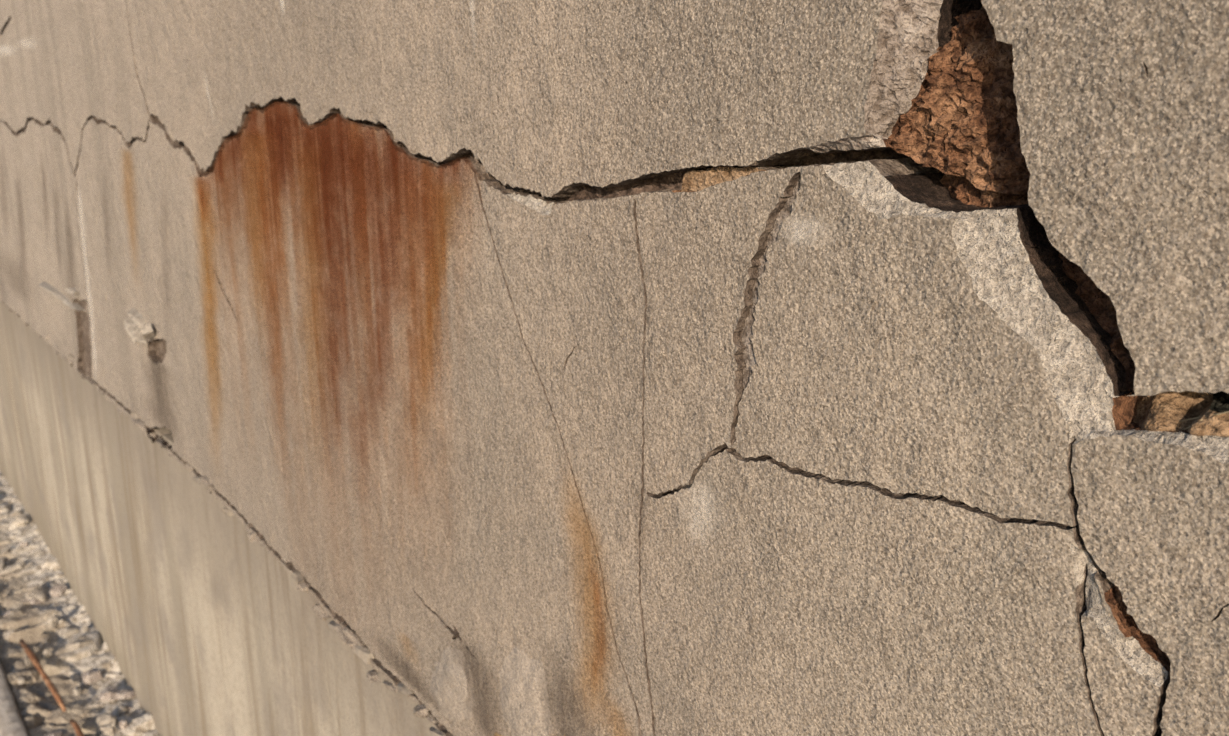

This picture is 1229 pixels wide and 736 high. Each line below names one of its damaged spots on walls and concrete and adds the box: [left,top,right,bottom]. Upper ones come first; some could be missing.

peeling [123,308,167,364]
crack [95,383,453,736]
crack [412,588,476,659]
crack [474,173,641,736]
crack [0,0,1229,437]
crack [633,172,1171,736]
spalling [797,0,1229,464]
spalling [1070,543,1168,687]
crack [1211,604,1229,622]